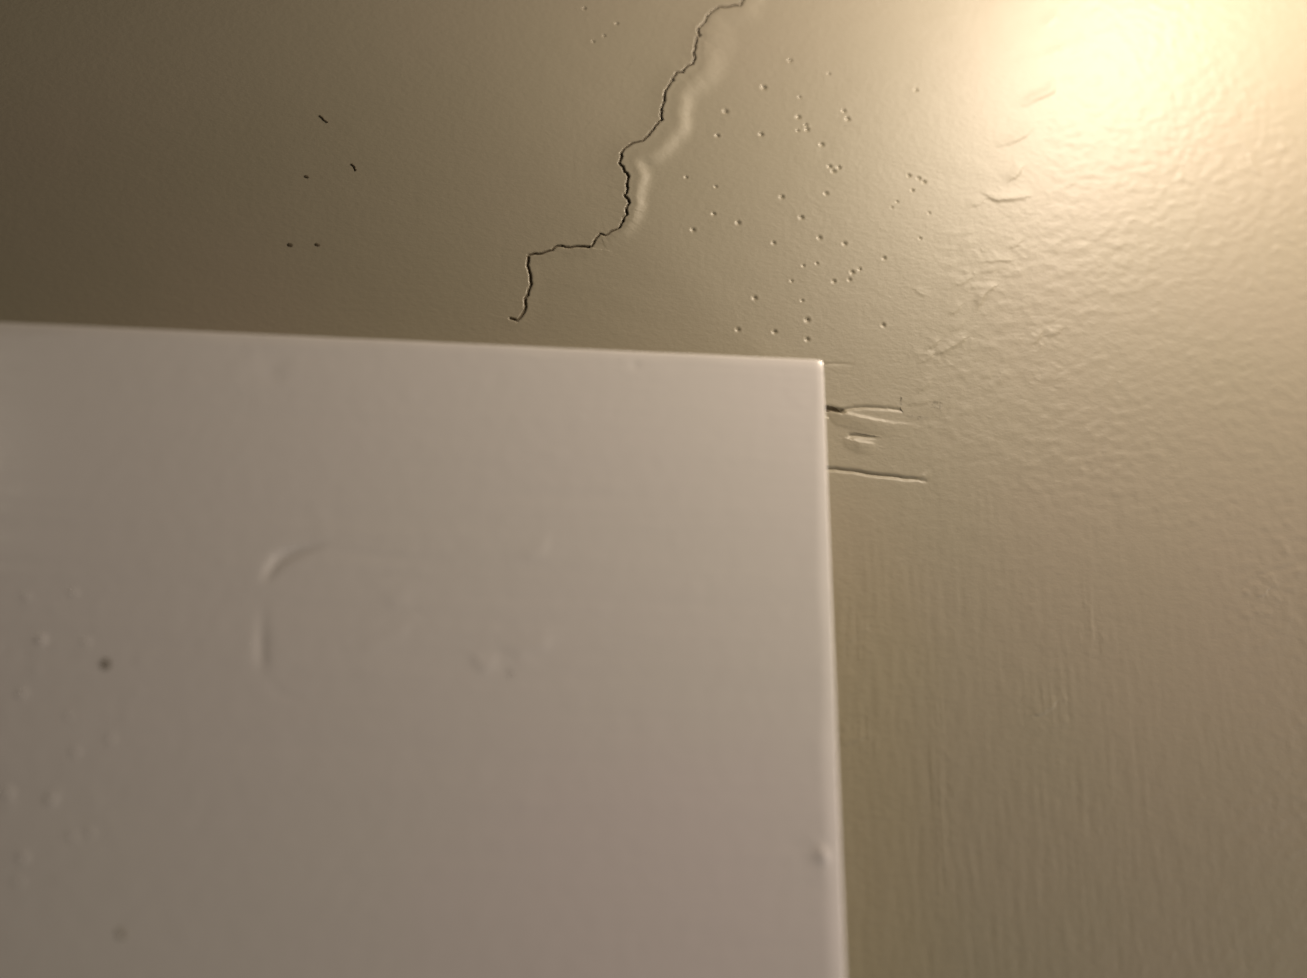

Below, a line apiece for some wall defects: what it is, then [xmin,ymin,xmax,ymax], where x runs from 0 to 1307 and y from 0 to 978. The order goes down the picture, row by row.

crack [483,0,816,346]
crack [806,354,949,492]